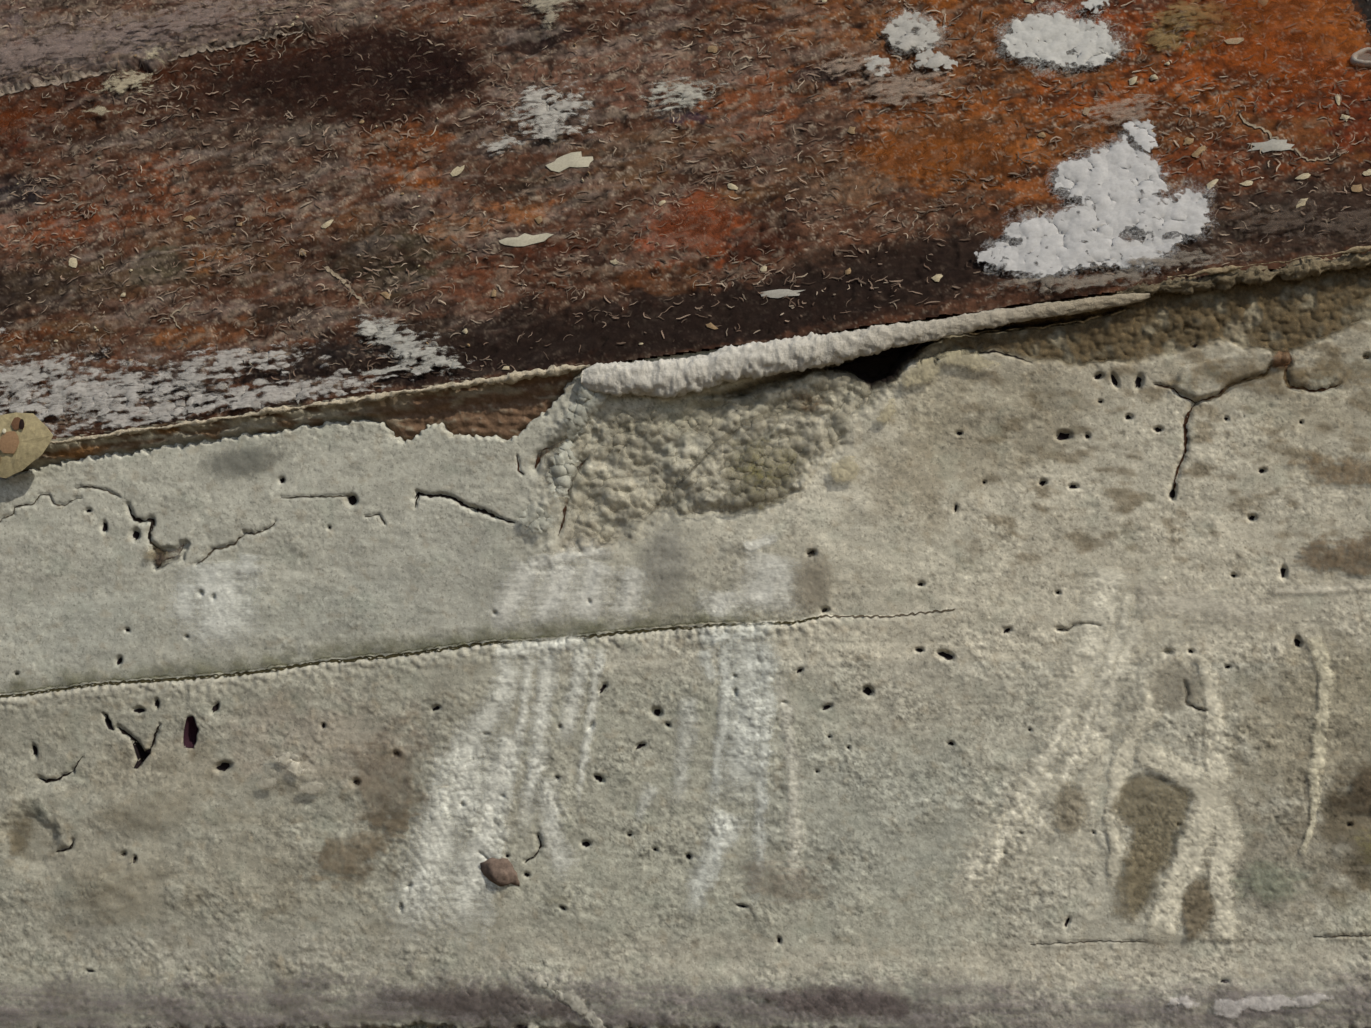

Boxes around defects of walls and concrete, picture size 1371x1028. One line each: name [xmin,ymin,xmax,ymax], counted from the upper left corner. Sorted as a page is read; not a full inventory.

crack [1155,365,1339,489]
crack [0,486,162,568]
crack [196,495,385,565]
crack [415,492,515,523]
crack [0,609,955,697]
crack [40,756,83,783]
crack [119,725,160,762]
water stain [399,533,688,924]
water stain [676,699,698,789]
water stain [688,535,831,905]
water stain [952,567,1371,940]
peeling [530,972,606,1028]